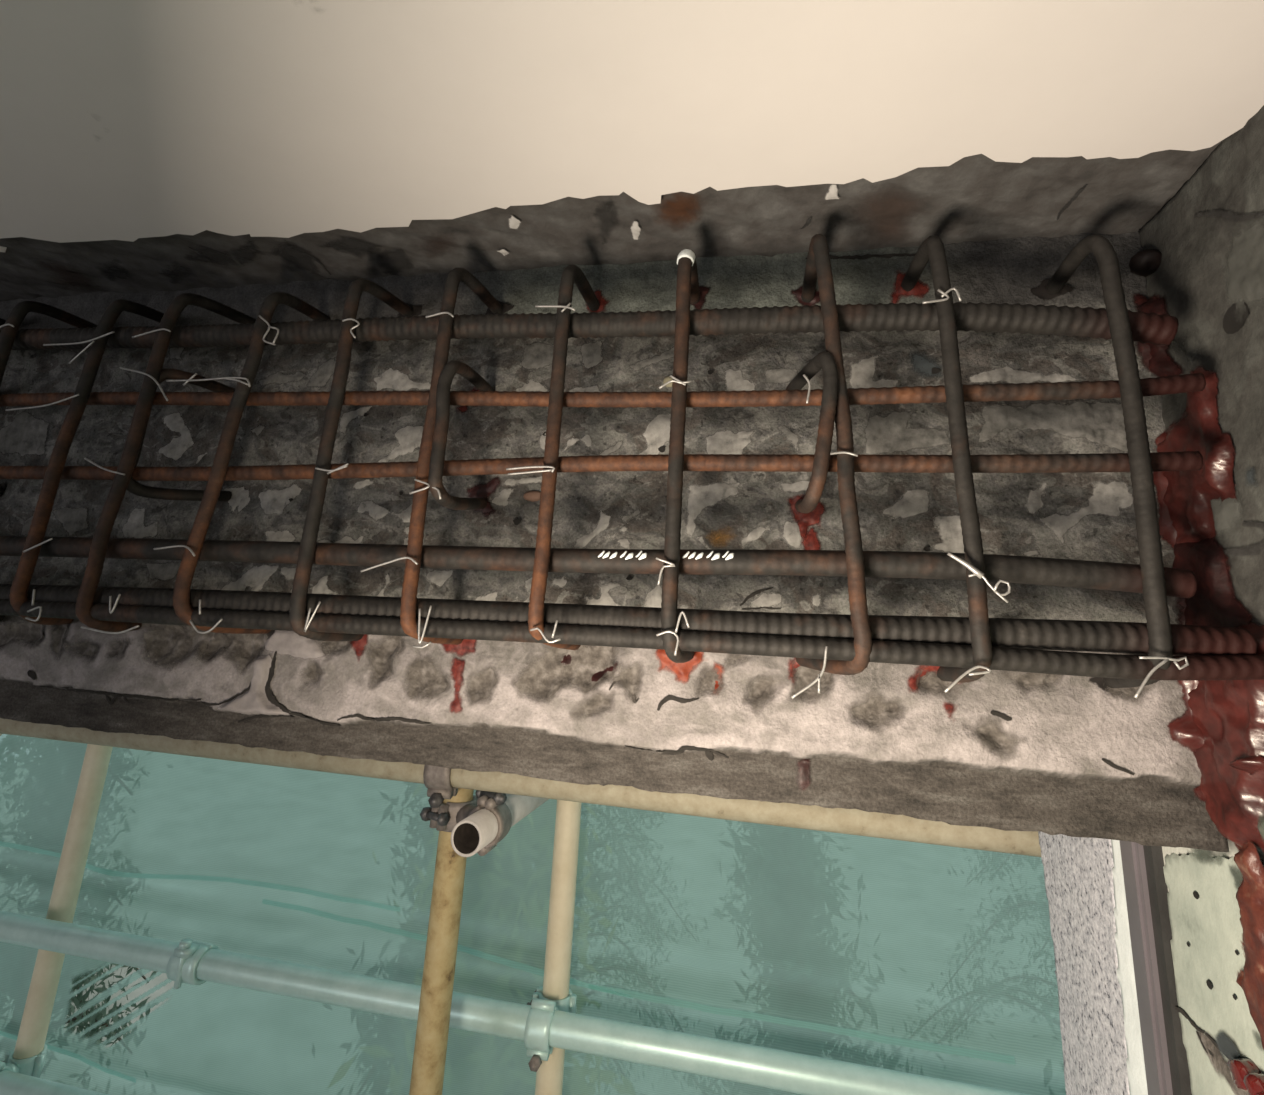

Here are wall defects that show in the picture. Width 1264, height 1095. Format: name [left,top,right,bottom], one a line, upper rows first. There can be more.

peeling [0,140,1223,301]
peeling [638,413,671,455]
peeling [741,521,804,549]
peeling [923,515,965,553]
peeling [644,585,662,608]
spalling [0,620,350,683]
crack [27,651,430,726]
spalling [367,636,450,699]
spalling [467,645,641,718]
spalling [743,666,833,713]
crack [625,746,729,761]
spalling [974,719,1017,757]